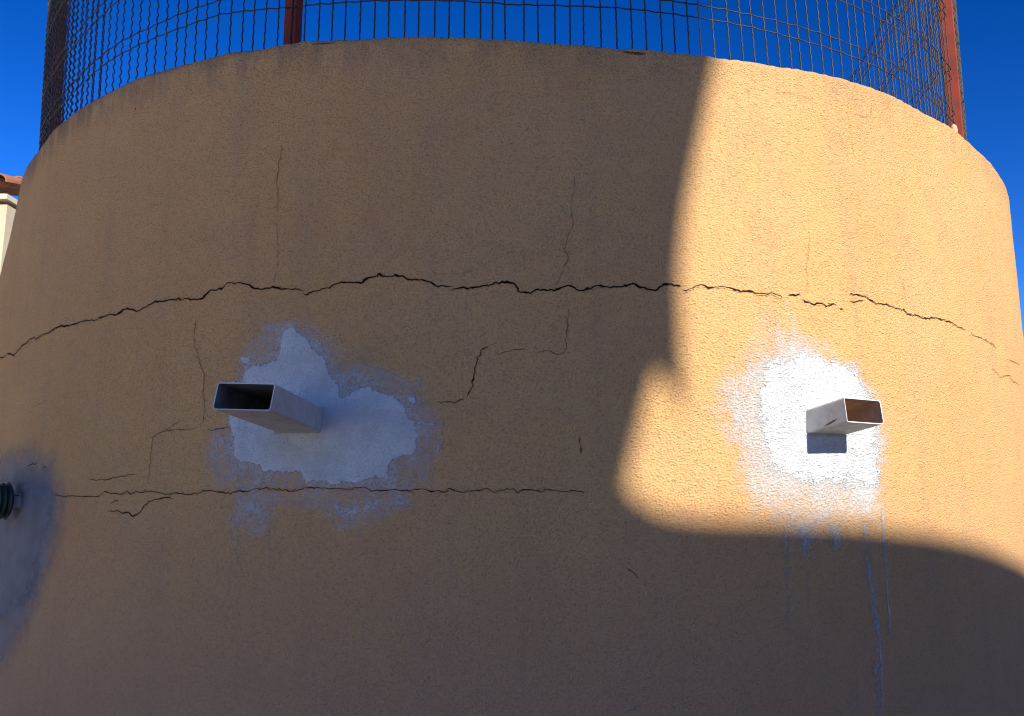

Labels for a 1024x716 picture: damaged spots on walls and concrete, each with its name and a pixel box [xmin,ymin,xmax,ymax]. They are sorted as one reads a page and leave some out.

crack [0,150,1020,517]
damp [866,510,891,716]